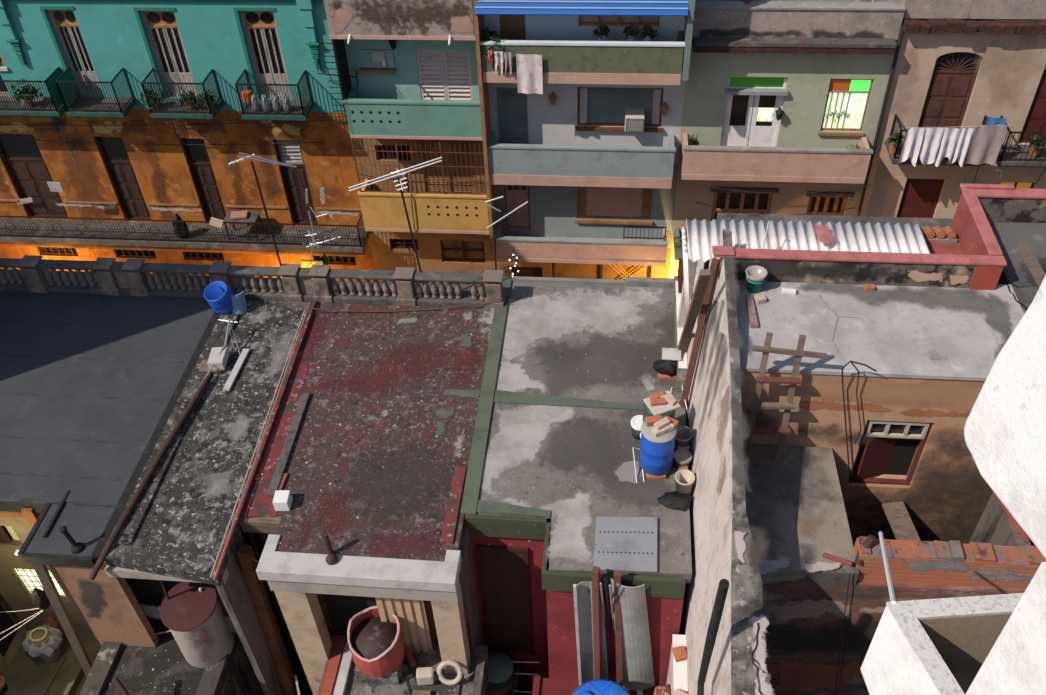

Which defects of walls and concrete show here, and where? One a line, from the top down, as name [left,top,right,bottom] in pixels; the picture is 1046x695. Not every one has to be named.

leakage [354,0,473,36]
crack [819,295,866,367]
leakage [538,314,677,396]
leakage [867,440,993,544]
leakage [748,528,768,571]
spalling [902,559,1033,581]
leakage [746,595,766,617]
leakage [765,622,879,655]